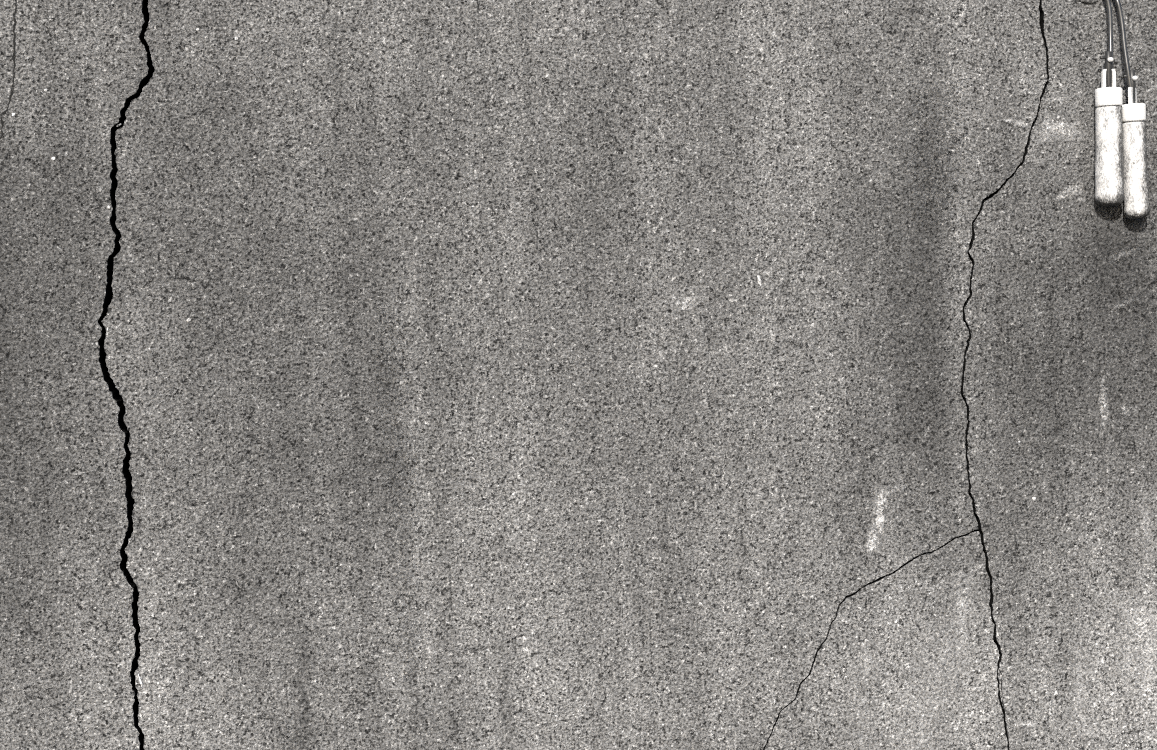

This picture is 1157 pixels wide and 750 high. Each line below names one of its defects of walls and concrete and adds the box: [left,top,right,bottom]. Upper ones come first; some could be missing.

crack [97,0,155,750]
crack [763,0,1050,750]